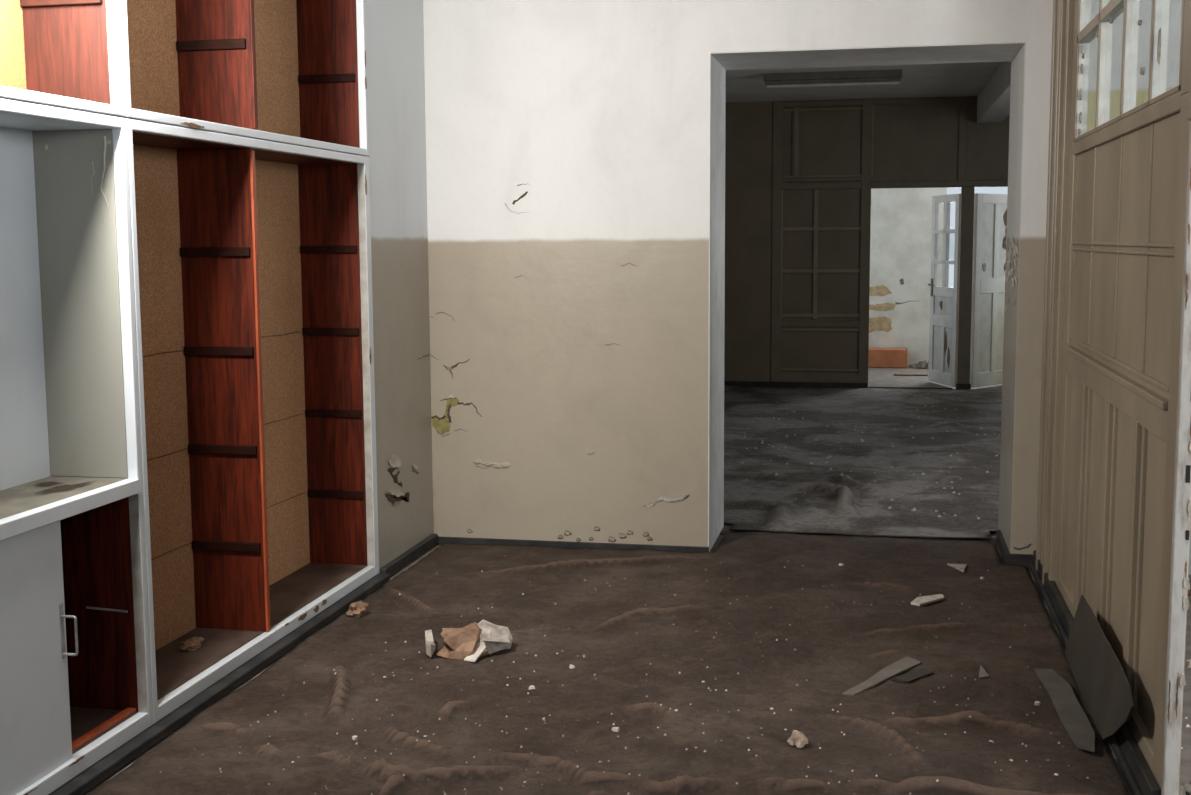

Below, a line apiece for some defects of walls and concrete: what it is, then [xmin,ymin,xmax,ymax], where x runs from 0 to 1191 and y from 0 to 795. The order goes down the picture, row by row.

peeling [431,395,482,437]
peeling [384,455,419,506]
peeling [1168,672,1186,724]